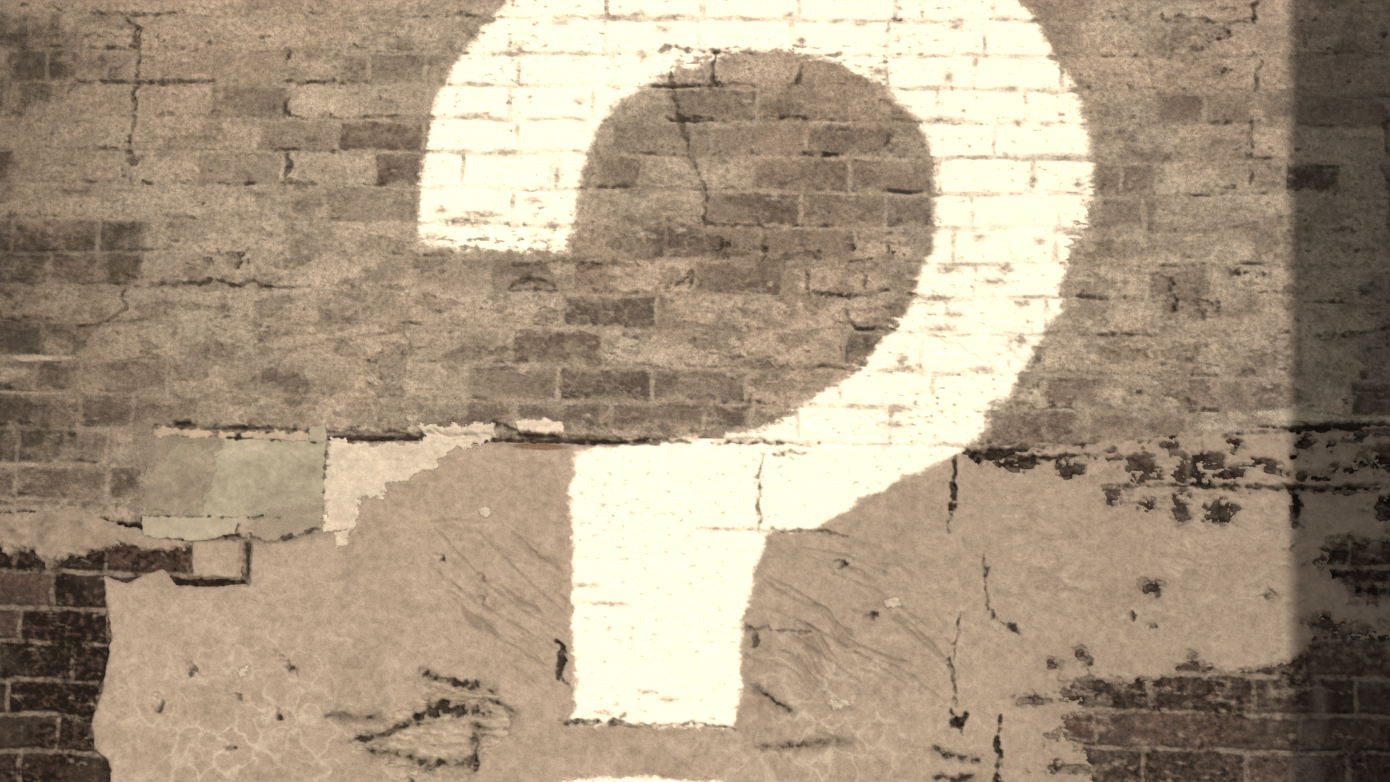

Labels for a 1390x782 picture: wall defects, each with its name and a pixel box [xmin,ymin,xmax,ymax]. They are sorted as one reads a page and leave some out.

crack [83,12,165,165]
crack [660,45,720,163]
crack [947,450,1078,530]
crack [1123,483,1370,528]
crack [948,558,1019,782]